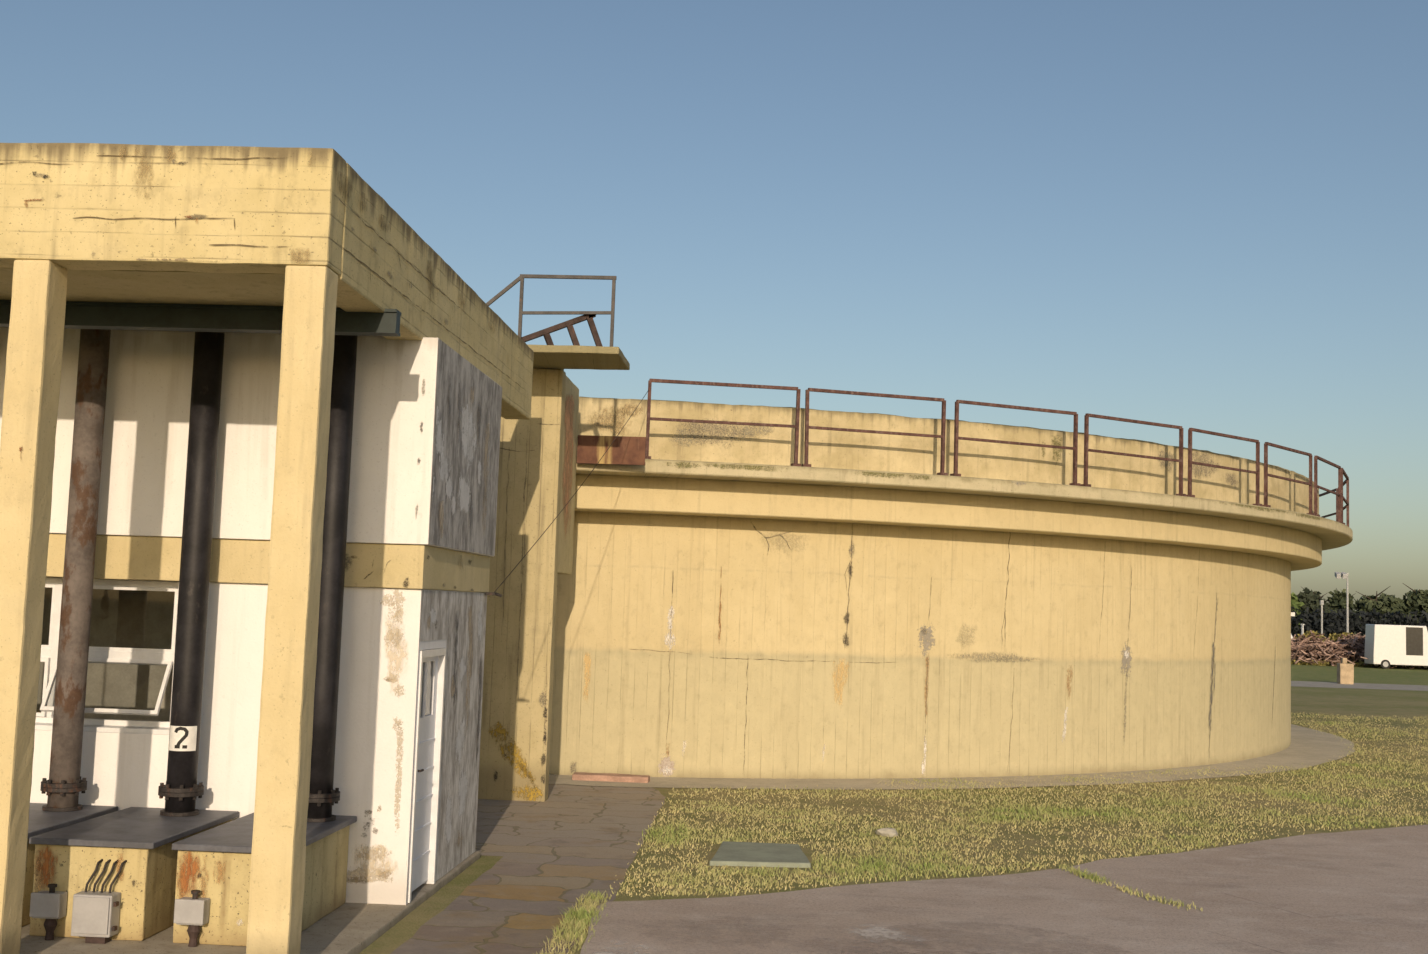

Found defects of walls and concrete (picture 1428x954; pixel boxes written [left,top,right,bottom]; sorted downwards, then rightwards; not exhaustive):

peeling [382,578,487,881]
crack [719,531,891,762]
rust [179,851,222,895]